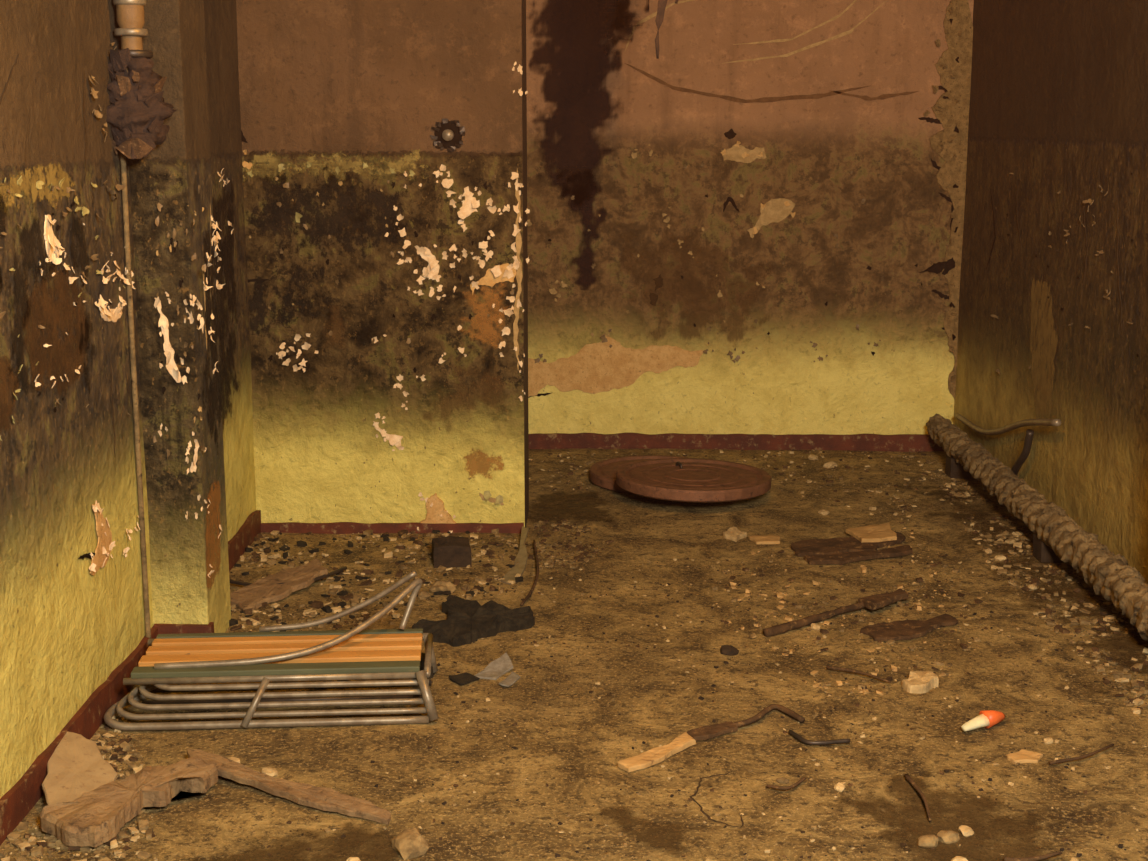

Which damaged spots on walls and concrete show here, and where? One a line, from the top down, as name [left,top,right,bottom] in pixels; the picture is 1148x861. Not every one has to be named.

damp [611,0,649,43]
damp [0,162,89,395]
peeling [15,186,135,412]
peeling [78,500,140,575]
peeling [153,203,234,474]
peeling [268,333,318,372]
damp [213,149,430,437]
peeling [373,412,404,451]
peeling [393,368,426,410]
peeling [385,164,714,402]